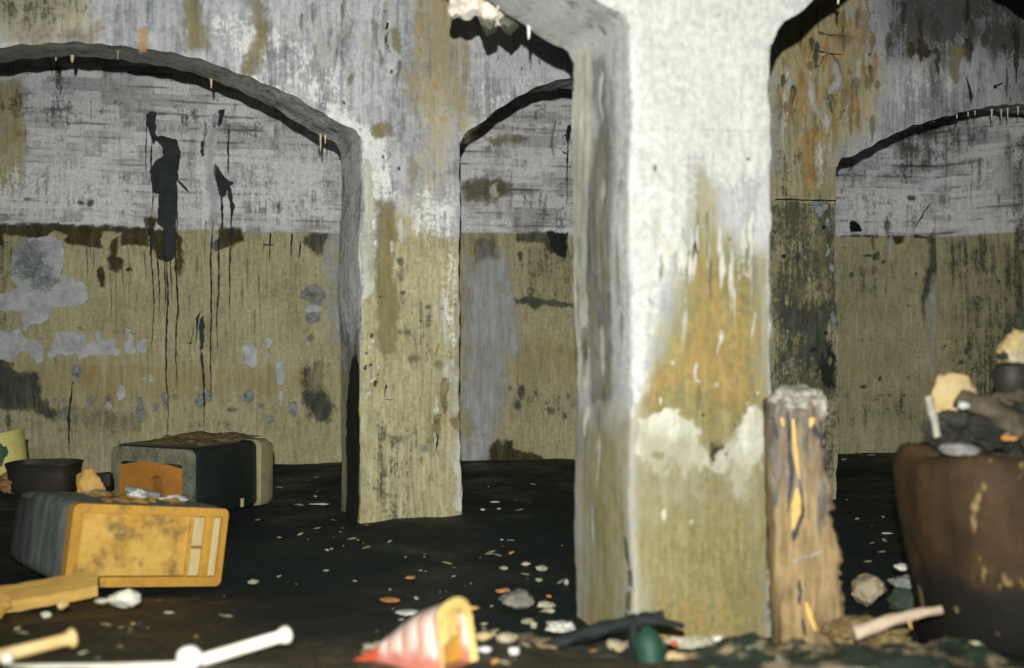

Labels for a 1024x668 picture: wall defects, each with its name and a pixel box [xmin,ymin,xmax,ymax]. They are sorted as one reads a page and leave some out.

corrosion [778,7,879,190]
peeling [0,236,147,382]
leakage [0,117,244,431]
leakage [290,233,339,298]
leakage [775,201,837,387]
leakage [0,359,72,454]
leakage [303,355,360,522]